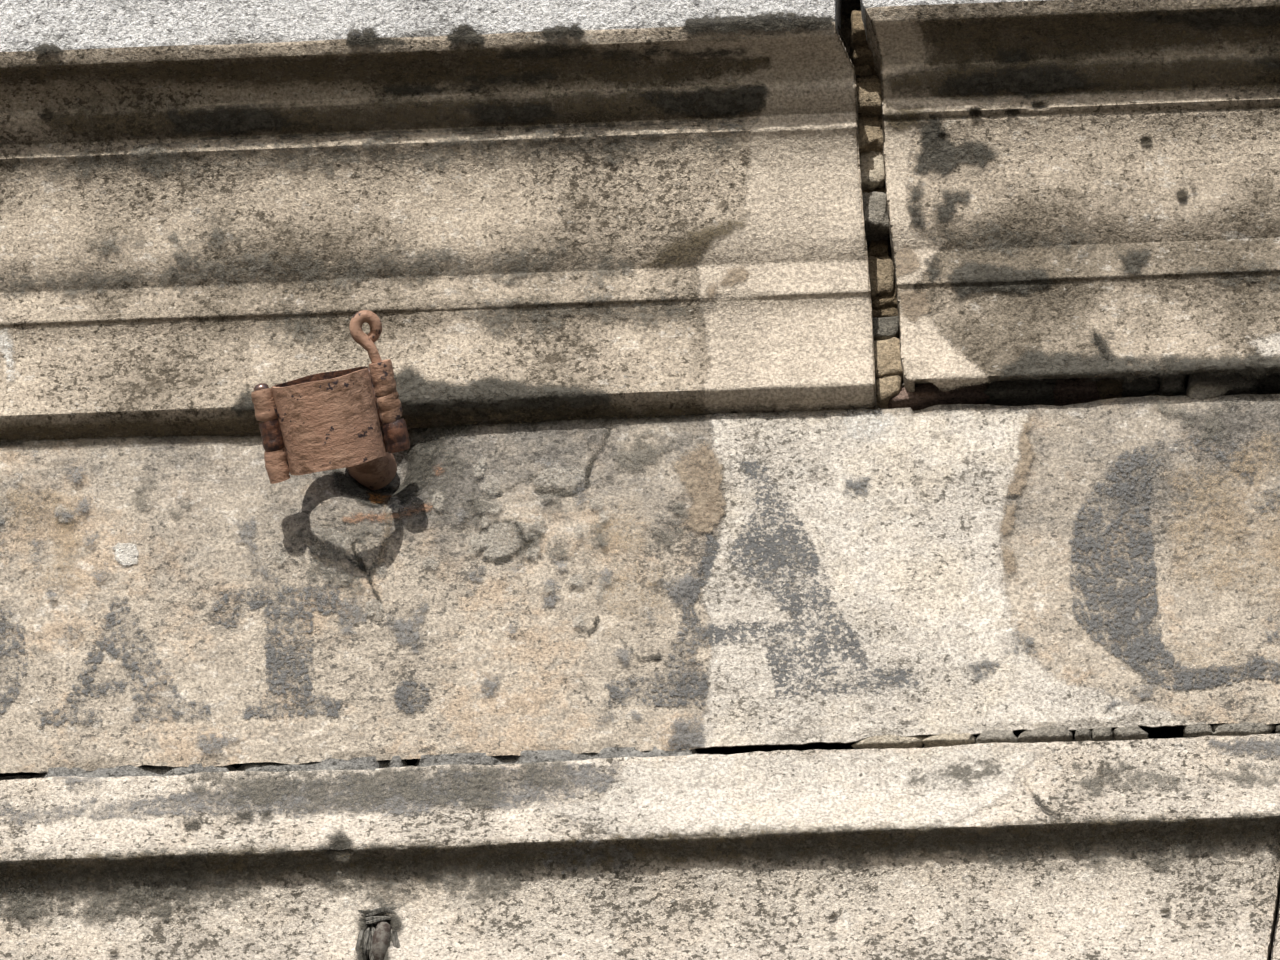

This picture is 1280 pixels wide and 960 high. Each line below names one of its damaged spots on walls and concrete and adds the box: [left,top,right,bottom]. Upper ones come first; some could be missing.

damp [870,4,1280,444]
damp [0,10,1204,749]
crack [471,431,610,504]
crack [320,524,390,604]
damp [197,734,238,755]
damp [1073,734,1280,798]
damp [0,746,1280,888]